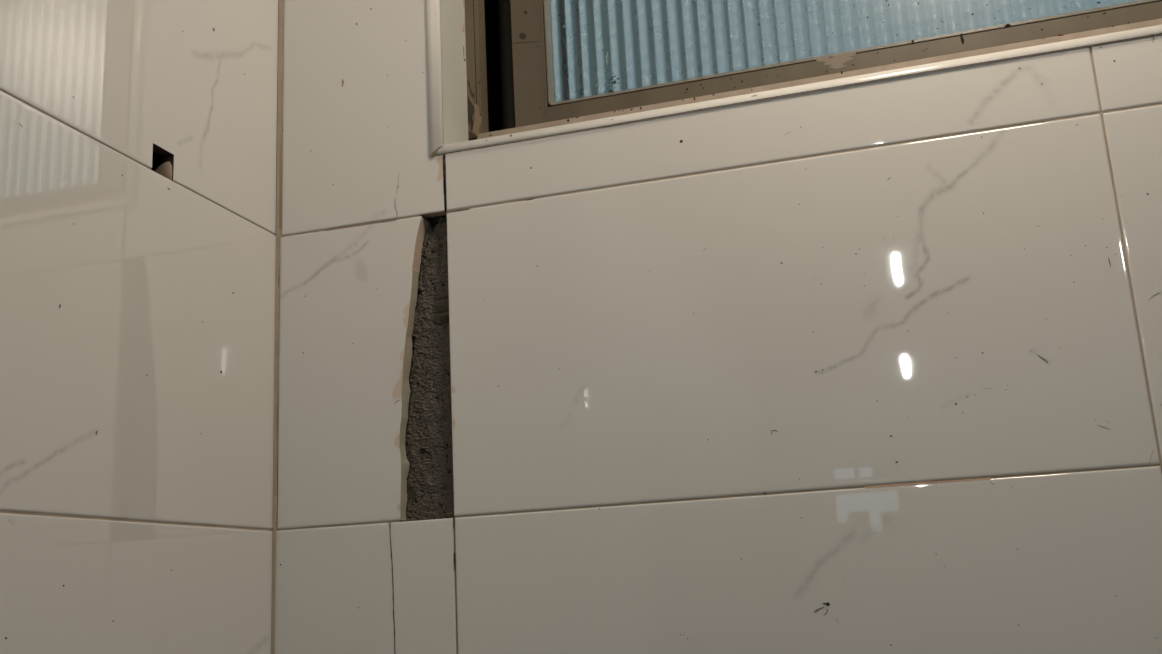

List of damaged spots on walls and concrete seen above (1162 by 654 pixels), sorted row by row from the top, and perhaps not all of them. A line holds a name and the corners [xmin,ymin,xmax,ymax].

crack [389,238,452,654]
spalling [388,215,456,524]